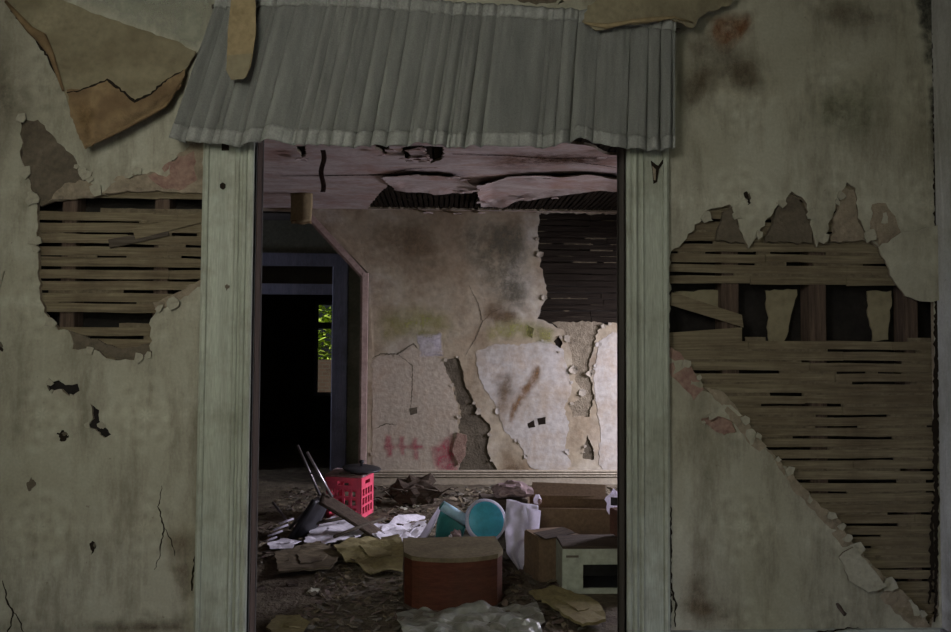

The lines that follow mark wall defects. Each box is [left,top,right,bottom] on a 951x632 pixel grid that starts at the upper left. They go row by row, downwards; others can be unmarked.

peeling [290,150,327,225]
flaking render [377,145,443,162]
flaking render [574,138,617,159]
flaking render [16,113,203,364]
flaking render [370,185,617,470]
spalling [46,378,80,397]
spalling [84,405,111,437]
flaking render [669,185,939,628]
crack [154,489,195,591]
crack [2,581,24,632]